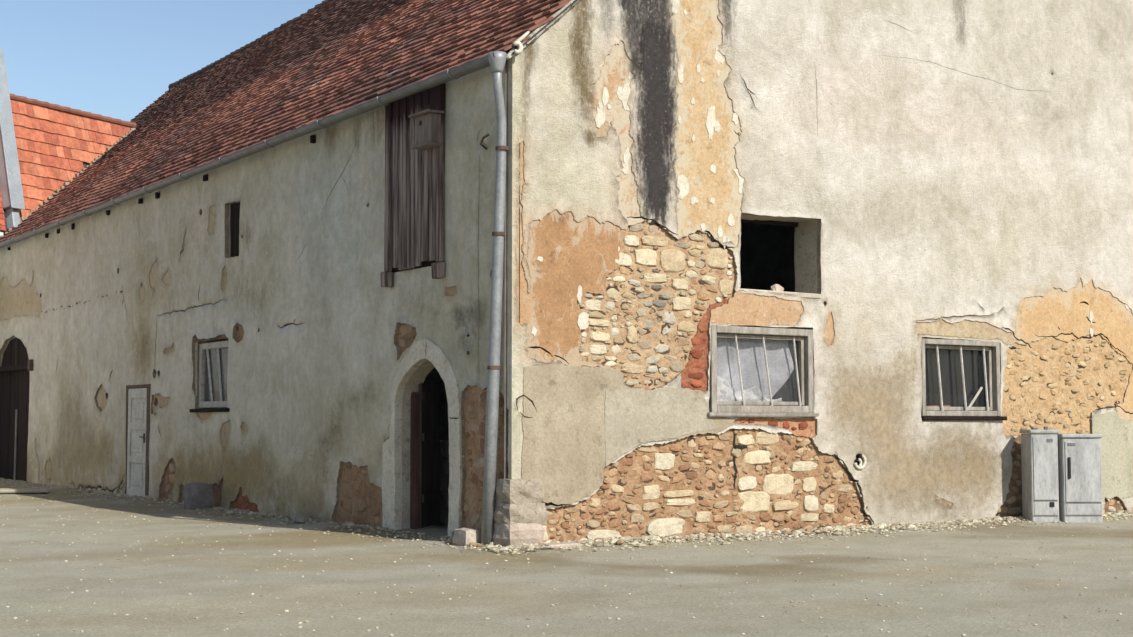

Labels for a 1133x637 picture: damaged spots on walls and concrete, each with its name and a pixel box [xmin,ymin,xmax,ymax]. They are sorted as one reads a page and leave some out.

leakage [623,0,675,222]
peeling [670,0,744,250]
peeling [0,275,42,321]
peeling [677,290,803,392]
peeling [915,279,1133,421]
spalling [161,459,184,503]
spalling [212,480,259,512]
spalling [334,462,383,527]
spalling [463,386,547,546]
flaking render [733,417,816,440]
spalling [997,436,1022,518]
spalling [1104,497,1125,513]